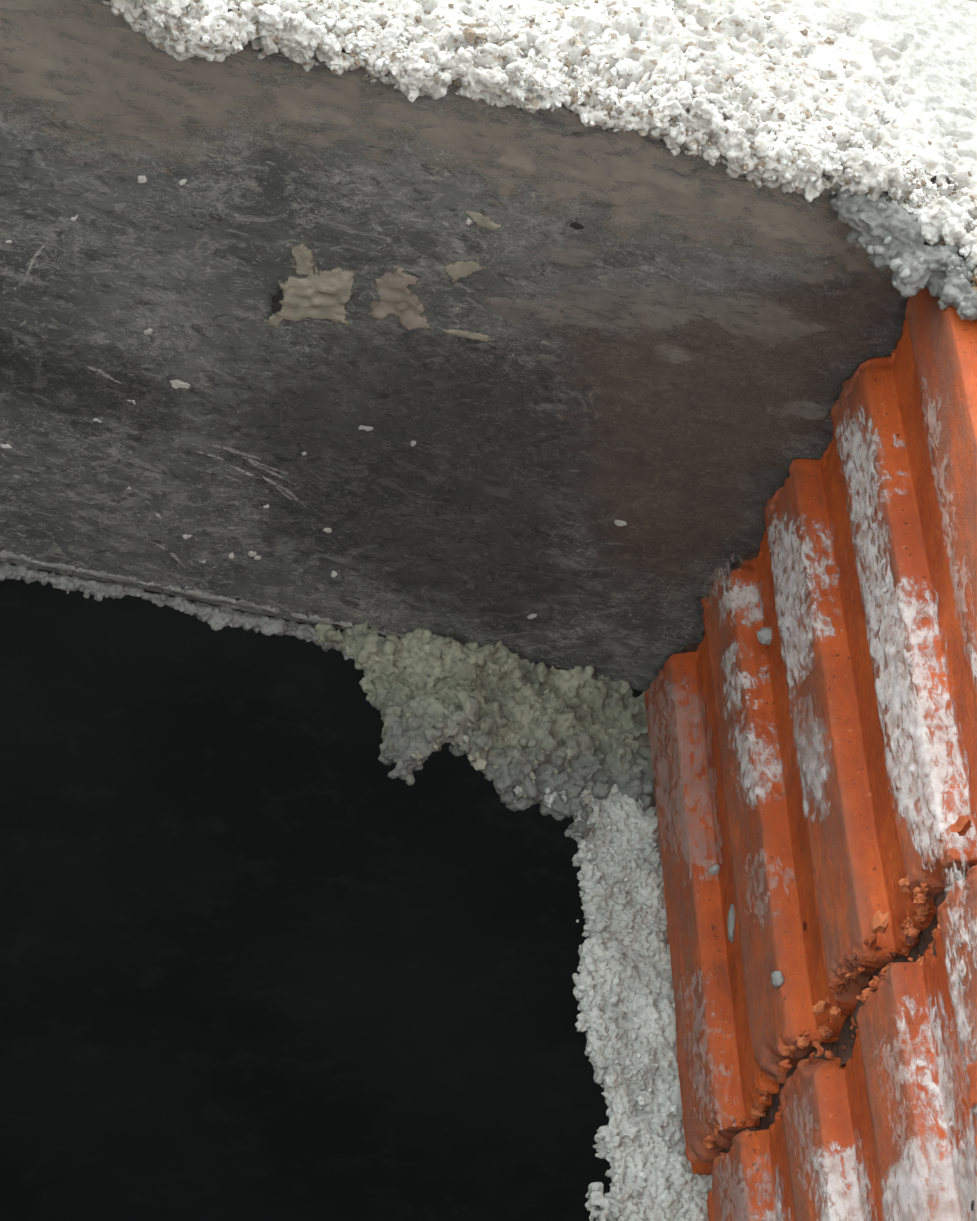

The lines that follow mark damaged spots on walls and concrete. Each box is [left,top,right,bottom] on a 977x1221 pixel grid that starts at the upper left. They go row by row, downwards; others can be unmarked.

peeling [465,210,501,230]
peeling [263,243,358,328]
peeling [368,265,489,342]
peeling [445,260,485,283]
damp [714,516,839,819]
damp [765,398,977,894]
crack [950,815,971,836]
crack [703,864,977,1171]
damp [807,907,977,1221]
spalling [966,1062,977,1108]